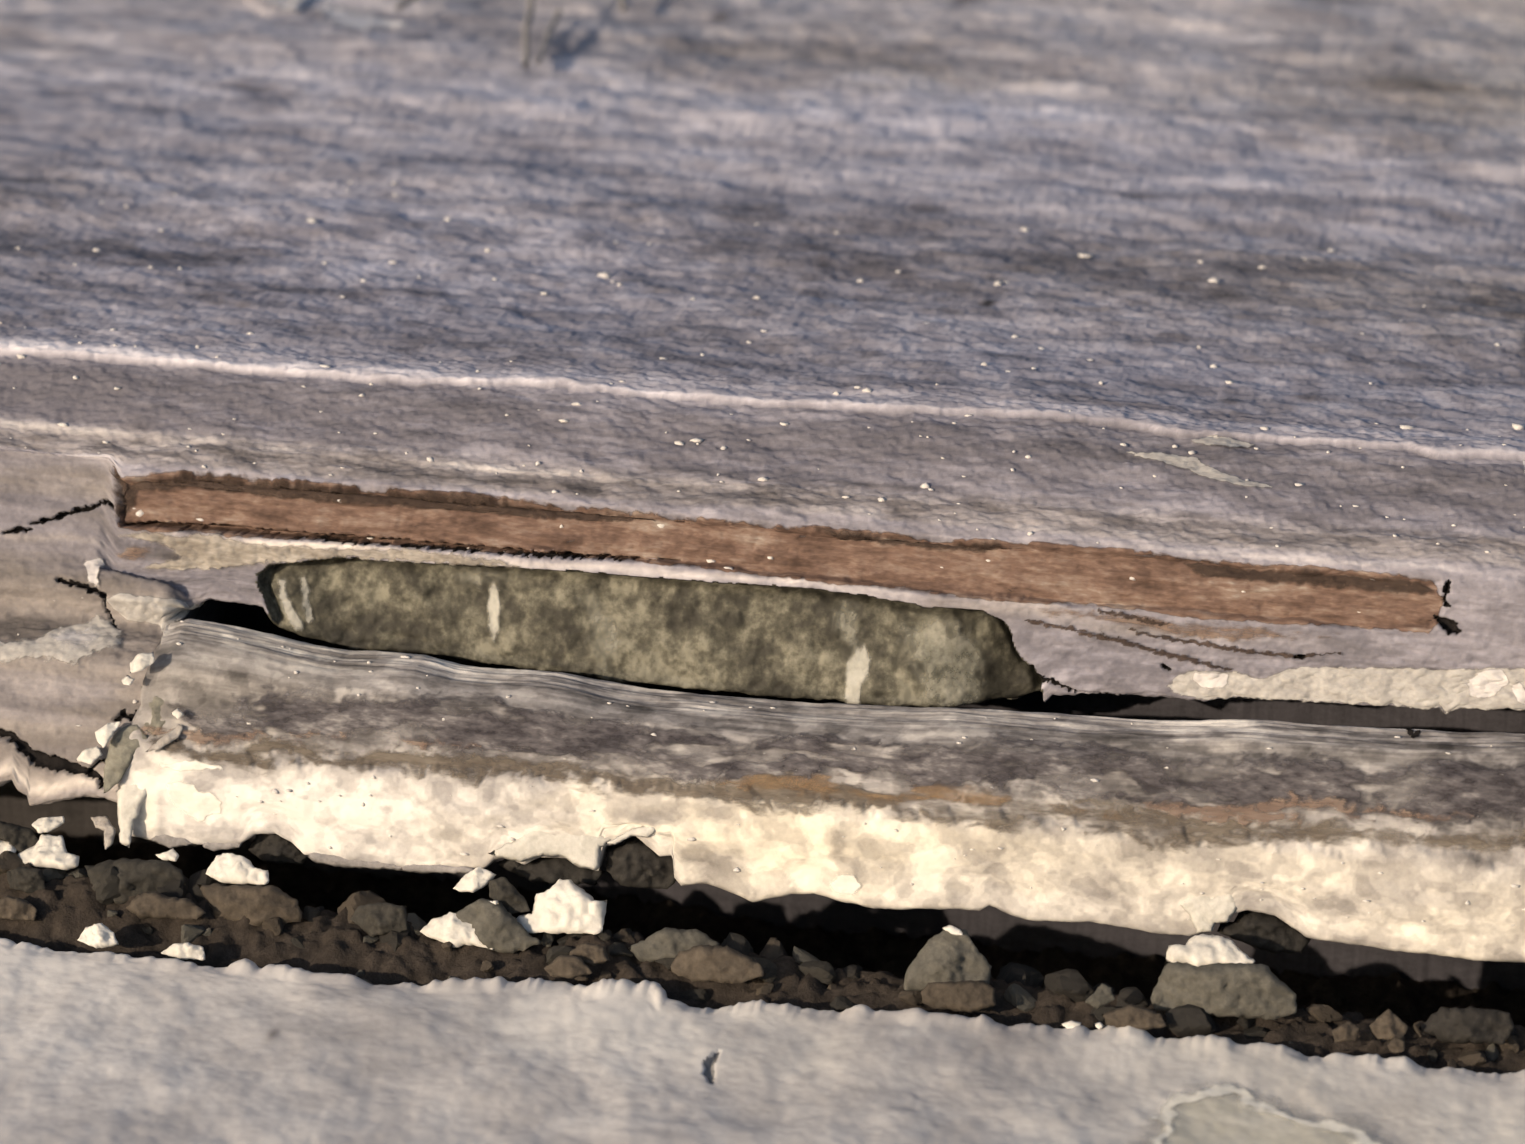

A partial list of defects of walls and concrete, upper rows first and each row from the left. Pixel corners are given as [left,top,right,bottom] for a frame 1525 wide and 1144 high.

crack [4,499,114,534]
crack [279,532,636,562]
crack [57,577,117,628]
spalling [1161,654,1525,714]
crack [0,729,105,789]